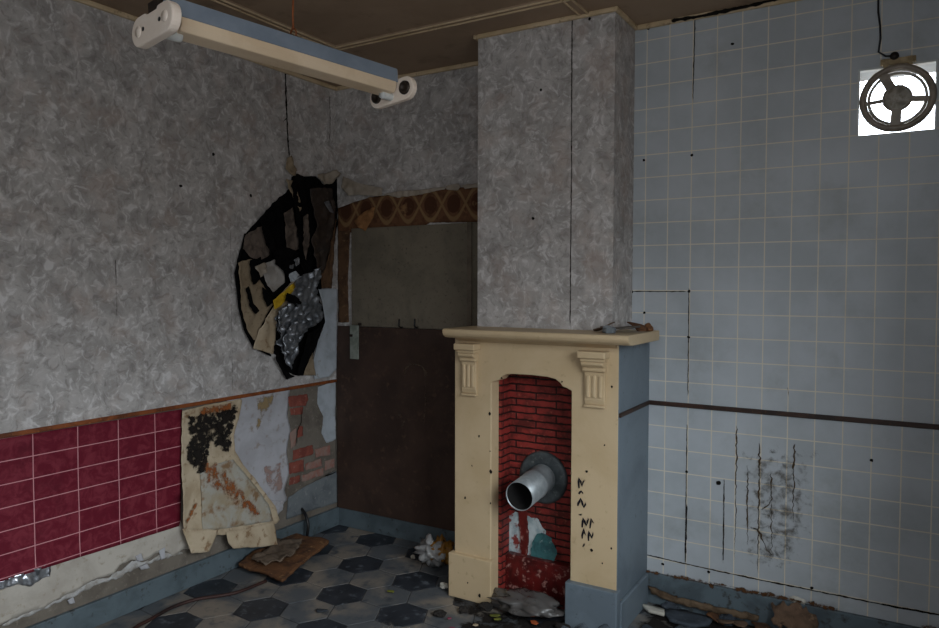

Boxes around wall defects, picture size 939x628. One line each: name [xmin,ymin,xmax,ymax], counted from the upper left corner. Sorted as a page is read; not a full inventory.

flaking render [270,382,337,520]
water stain [734,429,798,565]
spalling [0,521,189,626]